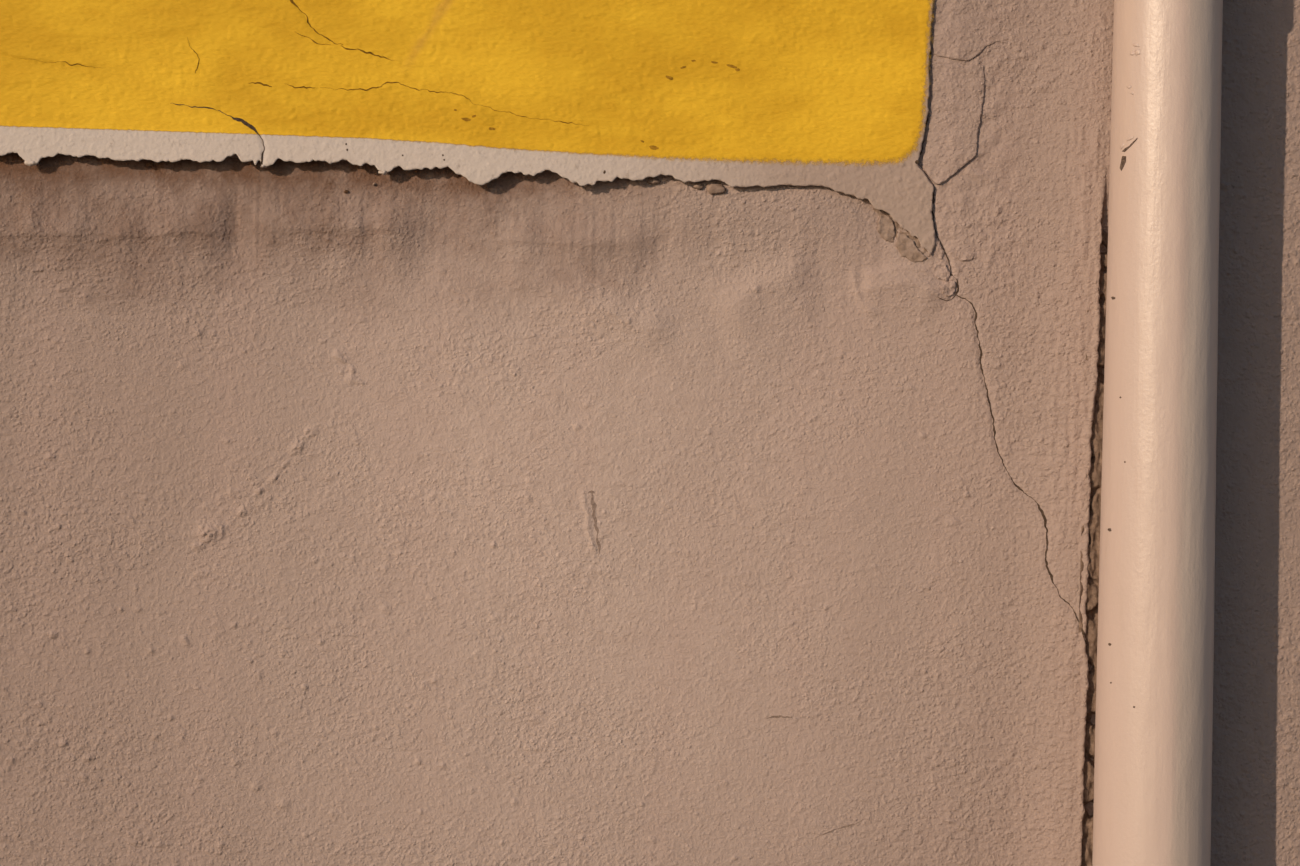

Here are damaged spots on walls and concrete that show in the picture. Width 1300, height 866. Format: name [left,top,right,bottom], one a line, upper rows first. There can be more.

crack [251,0,581,125]
crack [173,103,265,166]
flaking render [692,183,726,195]
crack [920,99,1087,644]